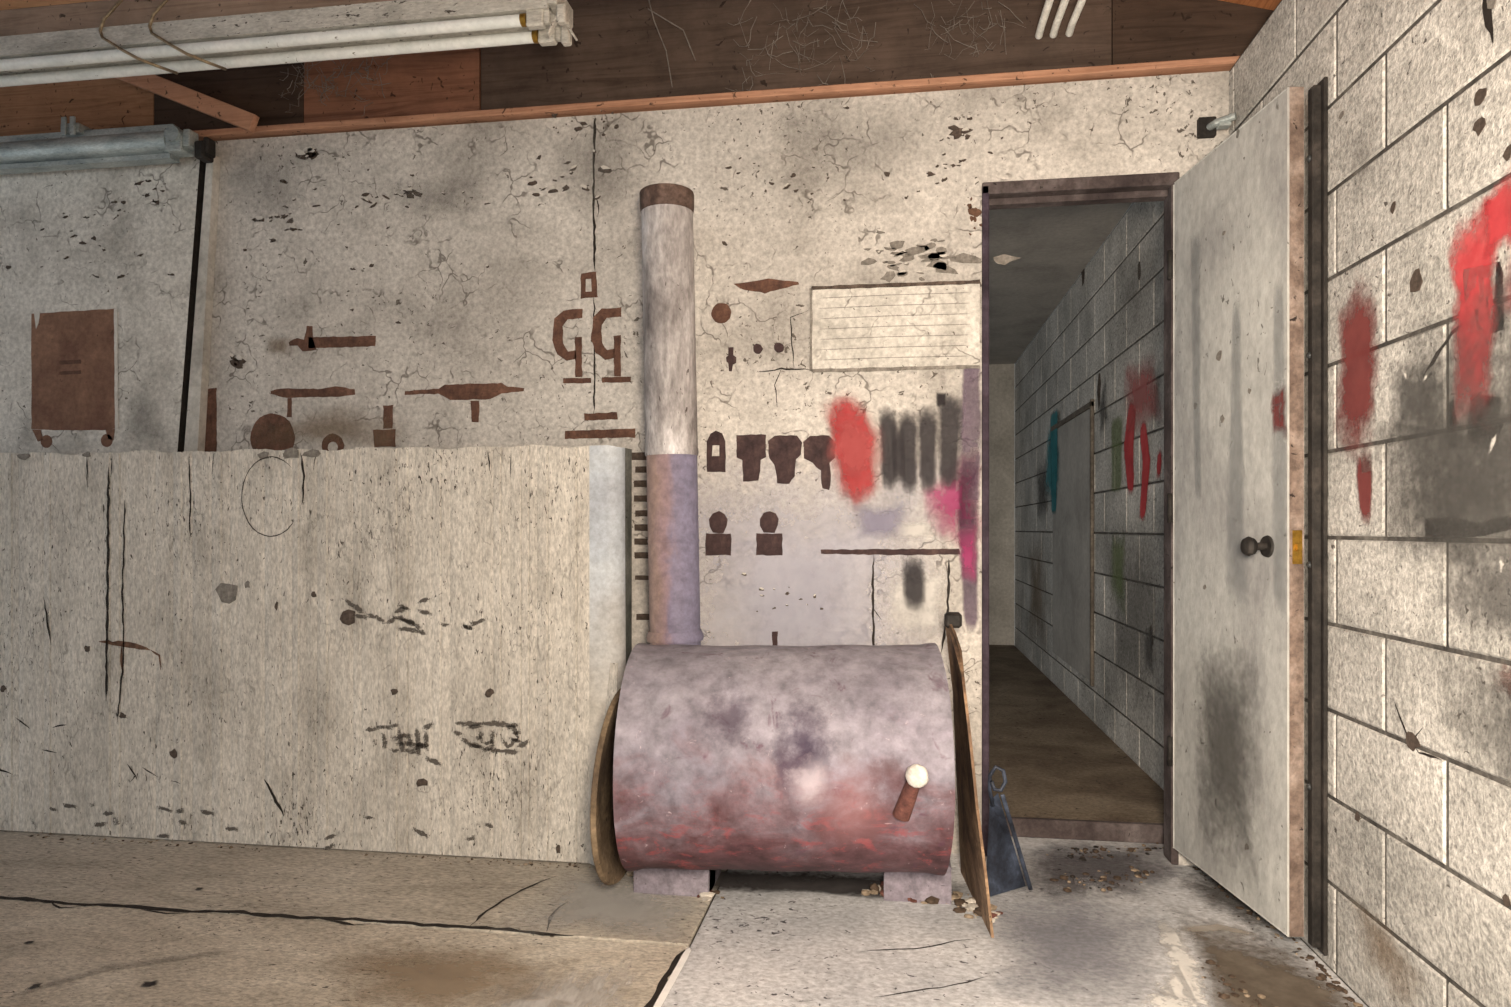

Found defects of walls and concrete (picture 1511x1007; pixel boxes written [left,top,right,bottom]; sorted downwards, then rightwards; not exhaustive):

crack [43,597,51,643]
crack [86,461,126,721]
crack [0,876,573,936]
damp [1148,921,1251,1007]